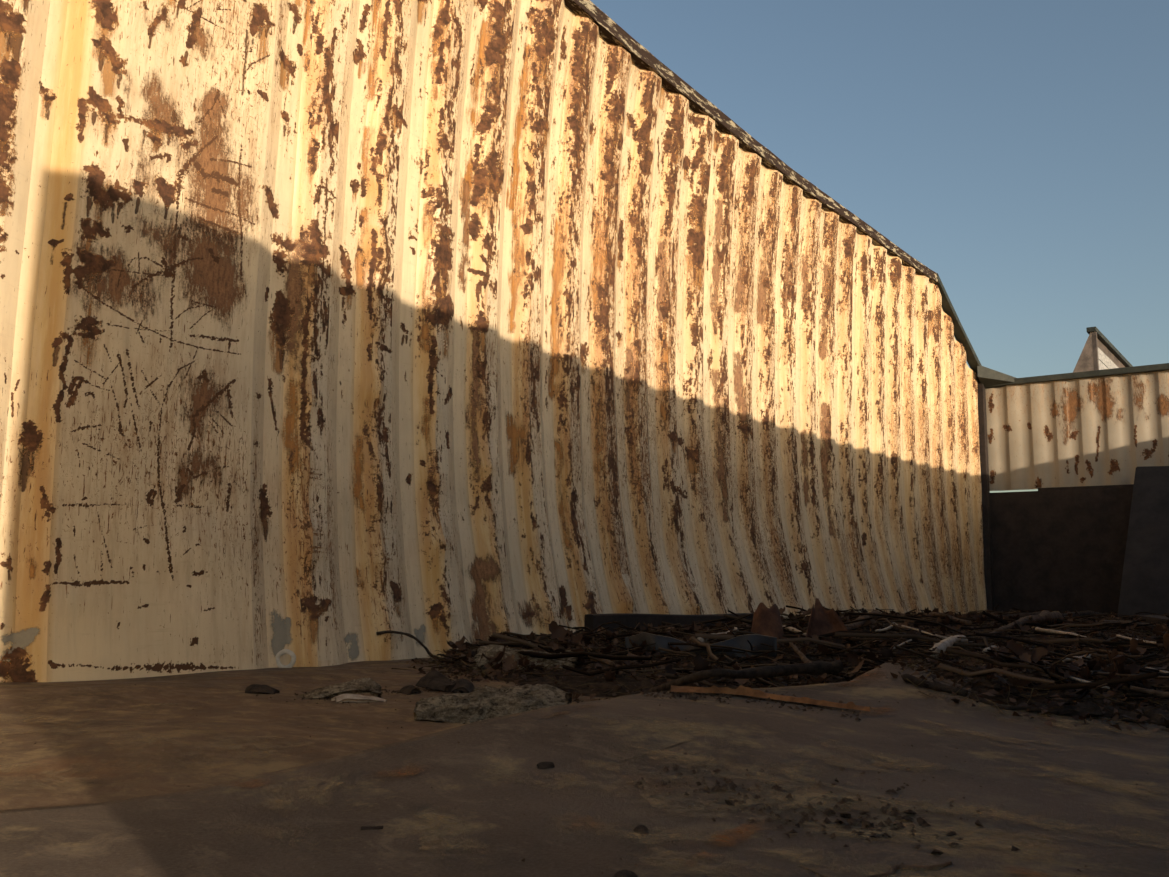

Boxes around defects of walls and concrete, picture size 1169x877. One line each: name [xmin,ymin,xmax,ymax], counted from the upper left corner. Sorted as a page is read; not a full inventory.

rust [0,0,30,279]
rust [39,81,56,120]
rust [48,0,394,474]
rust [366,0,732,485]
rust [734,228,958,360]
rust [4,373,56,522]
rust [733,351,751,443]
rust [1027,378,1123,483]
rust [0,556,13,580]
rust [30,538,62,612]
rust [462,555,544,644]
rust [0,647,38,683]